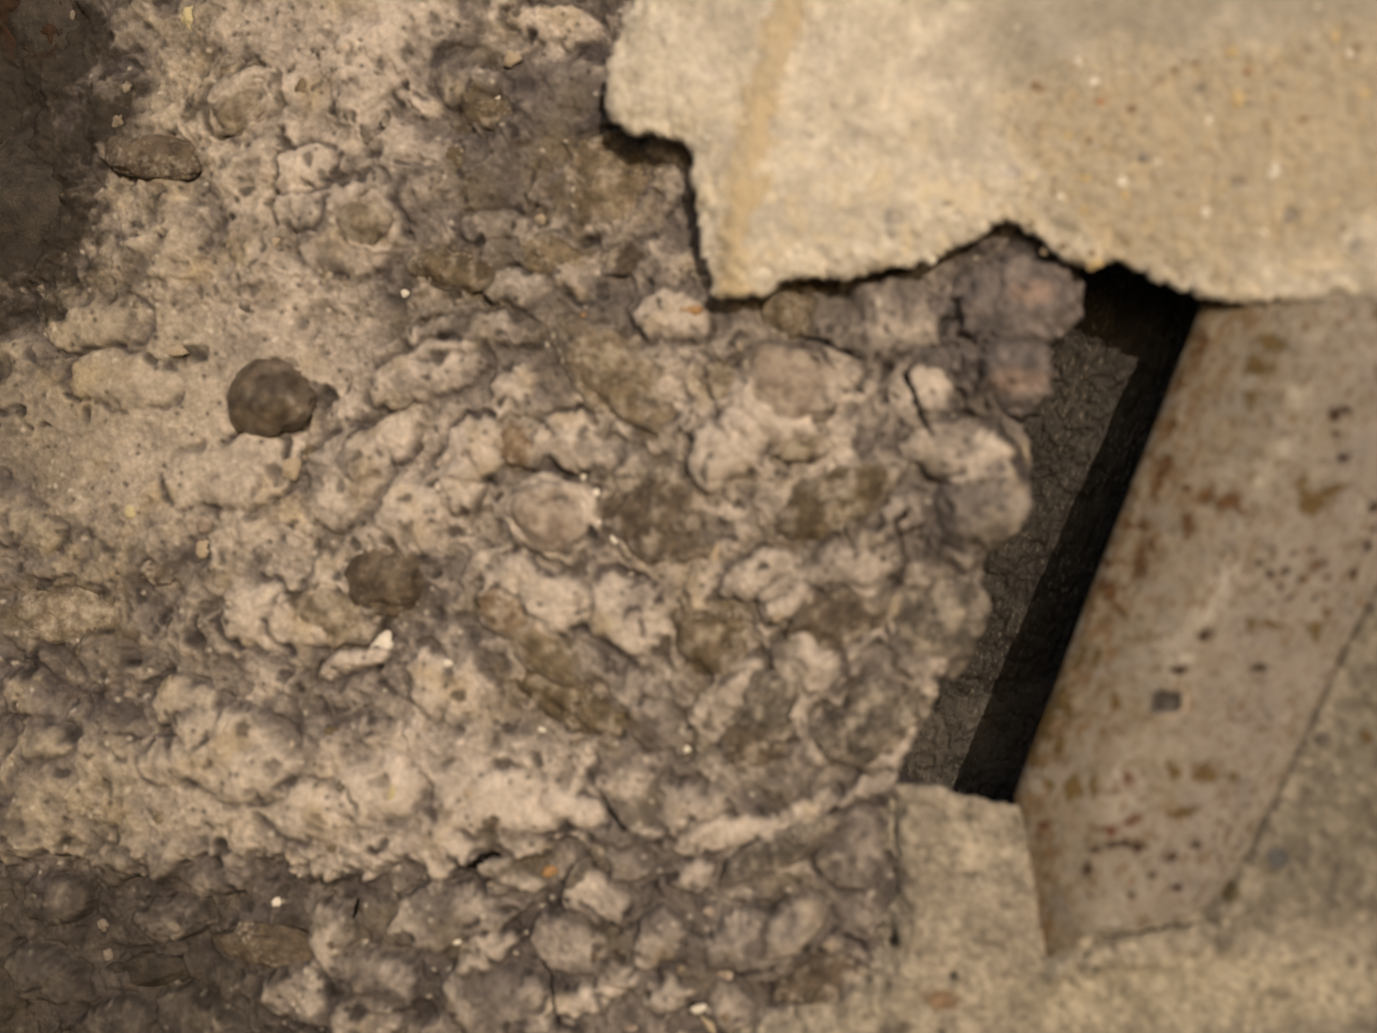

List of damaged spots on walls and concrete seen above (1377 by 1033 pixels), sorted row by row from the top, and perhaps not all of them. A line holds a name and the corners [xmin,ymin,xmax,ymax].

spalling [1085,250,1104,271]
corrosion [1243,335,1287,411]
corrosion [1328,406,1352,462]
spalling [0,0,1037,1033]
corrosion [1181,483,1248,539]
corrosion [1297,476,1343,517]
corrosion [1255,547,1333,644]
corrosion [1167,665,1191,675]
corrosion [1028,686,1136,809]
corrosion [1165,760,1239,782]
corrosion [1081,816,1148,878]
corrosion [1220,879,1240,903]